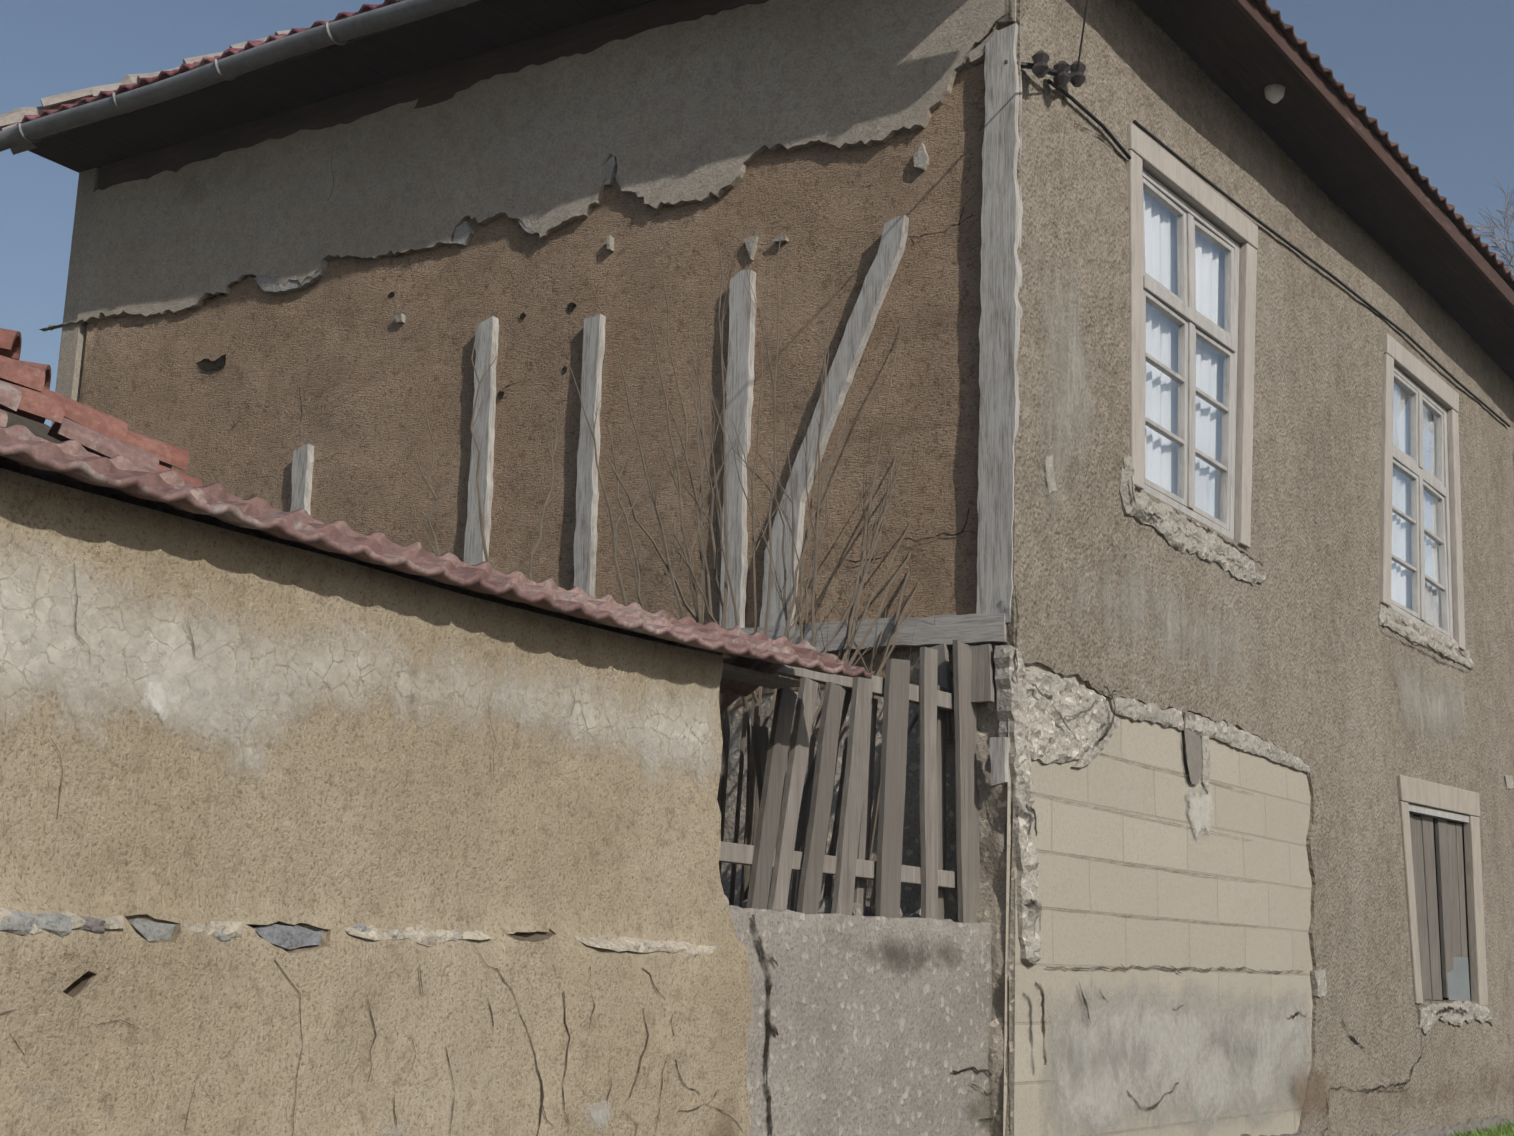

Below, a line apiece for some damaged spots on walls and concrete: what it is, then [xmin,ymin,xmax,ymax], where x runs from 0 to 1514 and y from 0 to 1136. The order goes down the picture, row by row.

crack [978,0,1013,55]
flaking render [79,25,1008,628]
crack [74,564,91,664]
flaking render [830,646,953,678]
spalling [125,914,180,943]
spalling [246,922,327,953]
flaking render [971,643,1327,1136]
crack [275,960,303,1136]
crack [367,996,455,1132]
crack [482,958,595,1136]
crack [605,915,778,1136]